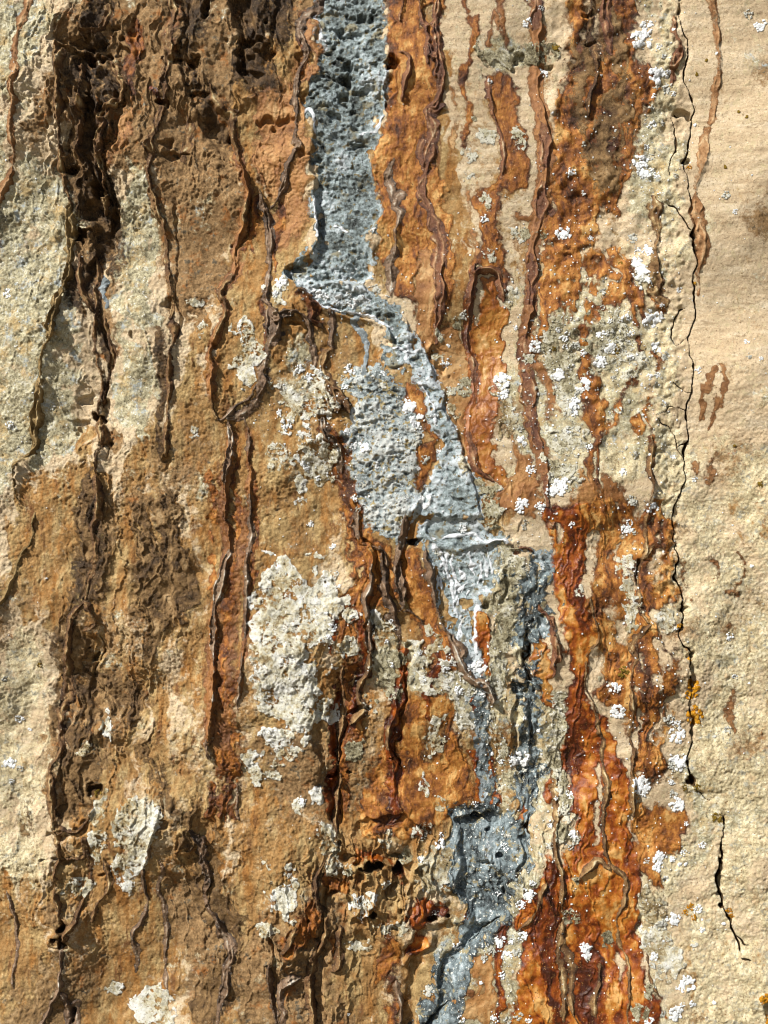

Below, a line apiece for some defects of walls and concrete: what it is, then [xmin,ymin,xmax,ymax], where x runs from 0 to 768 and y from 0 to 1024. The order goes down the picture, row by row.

damp [0,0,578,1024]
corrosion [371,0,690,1024]
crack [658,0,751,961]